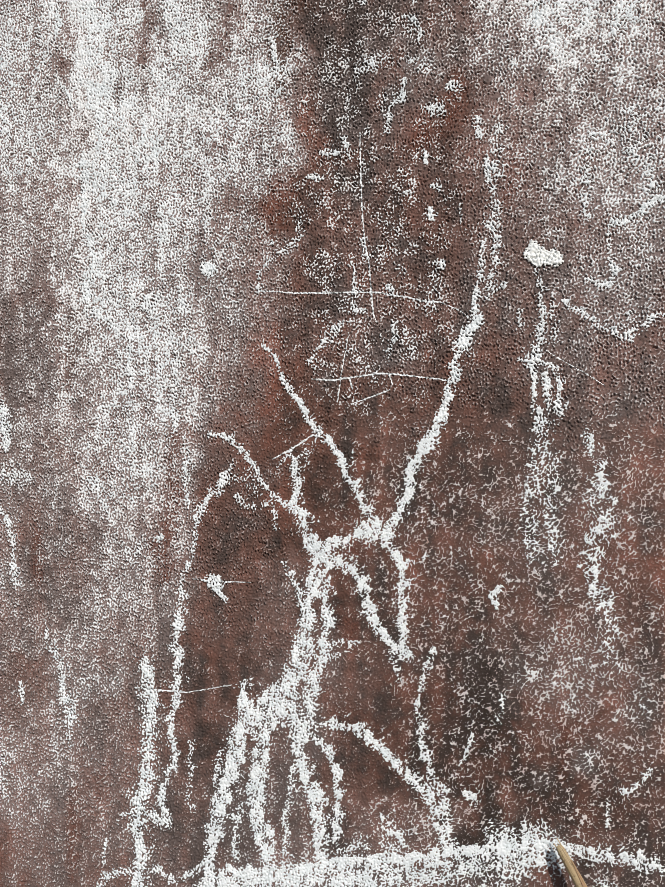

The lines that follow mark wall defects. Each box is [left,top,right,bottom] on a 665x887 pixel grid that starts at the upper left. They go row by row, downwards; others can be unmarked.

efflorescence [0,0,81,217]
efflorescence [347,0,431,136]
efflorescence [530,0,643,44]
efflorescence [76,0,297,518]
damp [96,98,665,887]